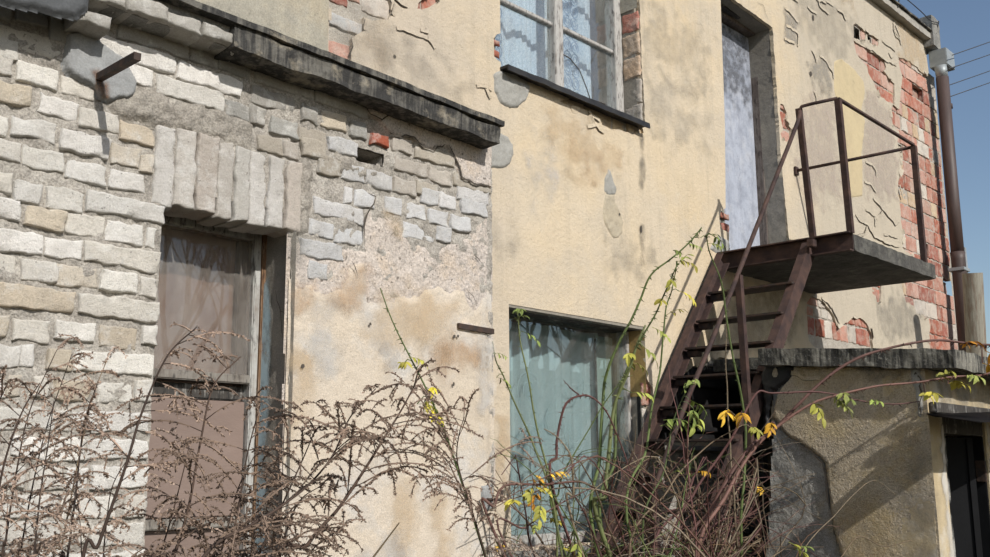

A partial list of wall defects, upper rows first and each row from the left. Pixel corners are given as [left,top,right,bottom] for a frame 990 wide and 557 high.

spalling [328,0,397,60]
spalling [560,11,643,134]
peeling [368,109,492,188]
spalling [854,23,958,350]
spalling [804,293,874,349]
spalling [632,450,727,557]
spalling [715,429,841,557]